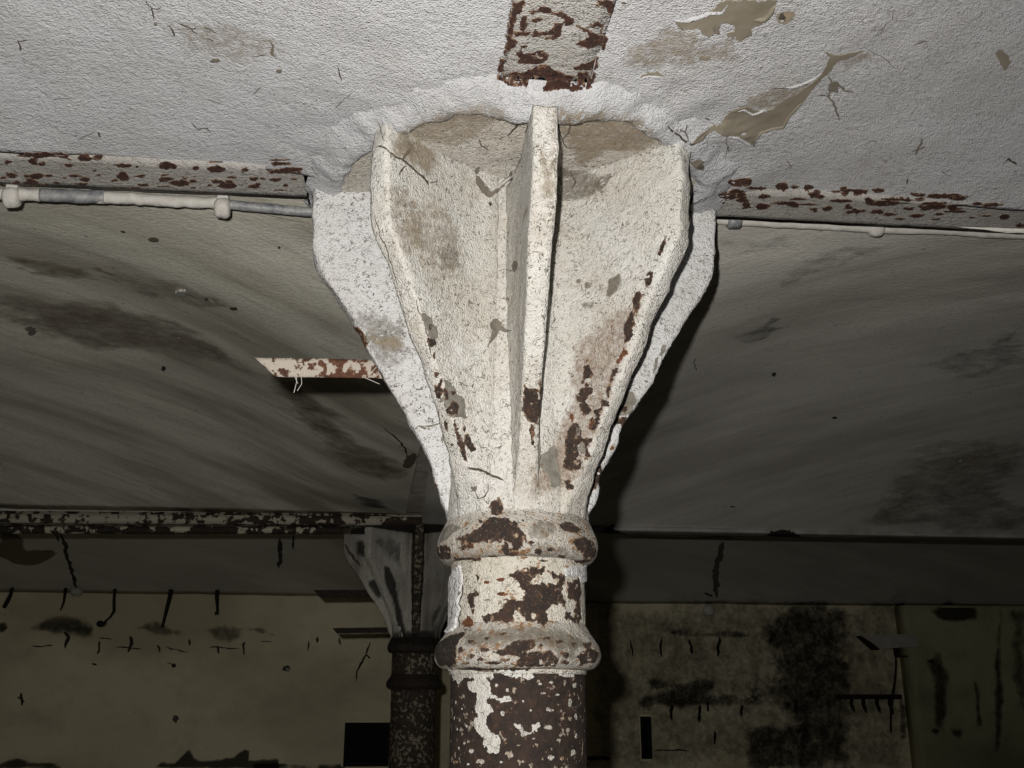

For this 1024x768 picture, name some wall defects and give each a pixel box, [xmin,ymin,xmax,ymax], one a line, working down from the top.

corrosion [497,0,626,92]
peeling [636,0,794,79]
peeling [692,50,896,152]
corrosion [0,152,303,191]
crack [375,120,438,185]
corrosion [718,177,1024,228]
corrosion [434,378,476,462]
corrosion [562,271,653,491]
corrosion [434,497,598,672]
water stain [749,726,808,768]